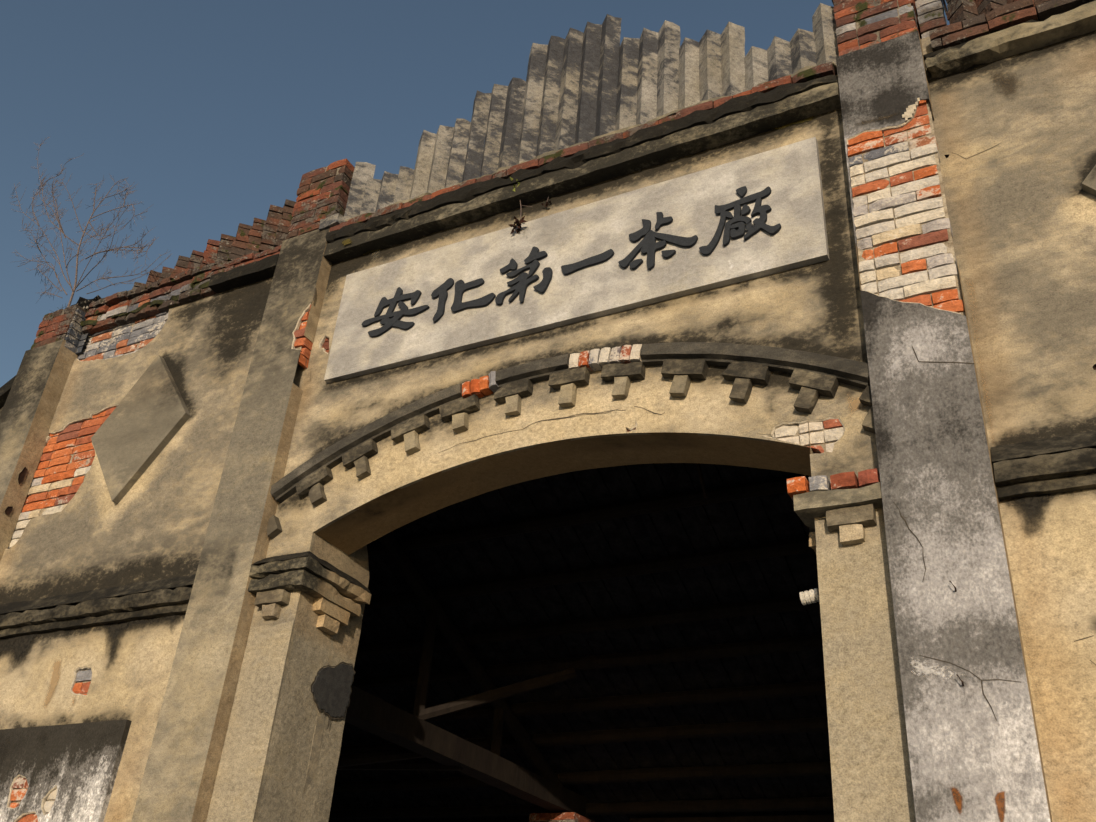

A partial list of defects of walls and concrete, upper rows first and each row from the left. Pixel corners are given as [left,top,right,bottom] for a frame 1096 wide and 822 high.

water stain [993,72,1018,95]
spalling [847,98,966,316]
spalling [77,311,169,362]
spalling [291,303,330,369]
spalling [462,371,499,398]
spalling [759,417,845,453]
spalling [5,404,118,549]
water stain [1016,494,1050,533]
spalling [6,774,57,822]
corrosion [951,788,962,813]
corrosion [995,792,1005,822]